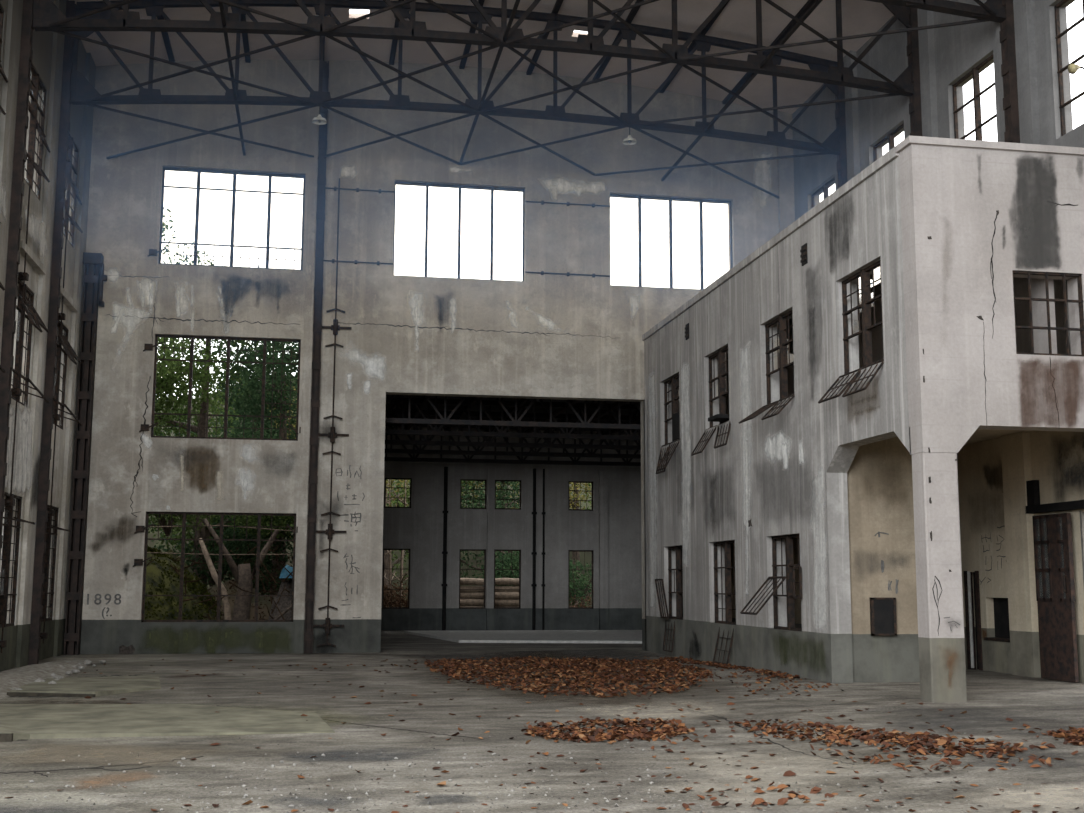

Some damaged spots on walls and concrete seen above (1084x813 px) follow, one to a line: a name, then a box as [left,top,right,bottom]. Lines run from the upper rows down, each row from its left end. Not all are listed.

water stain [1003,157,1059,268]
water stain [219,276,288,333]
crack [983,214,997,420]
crack [130,376,151,517]